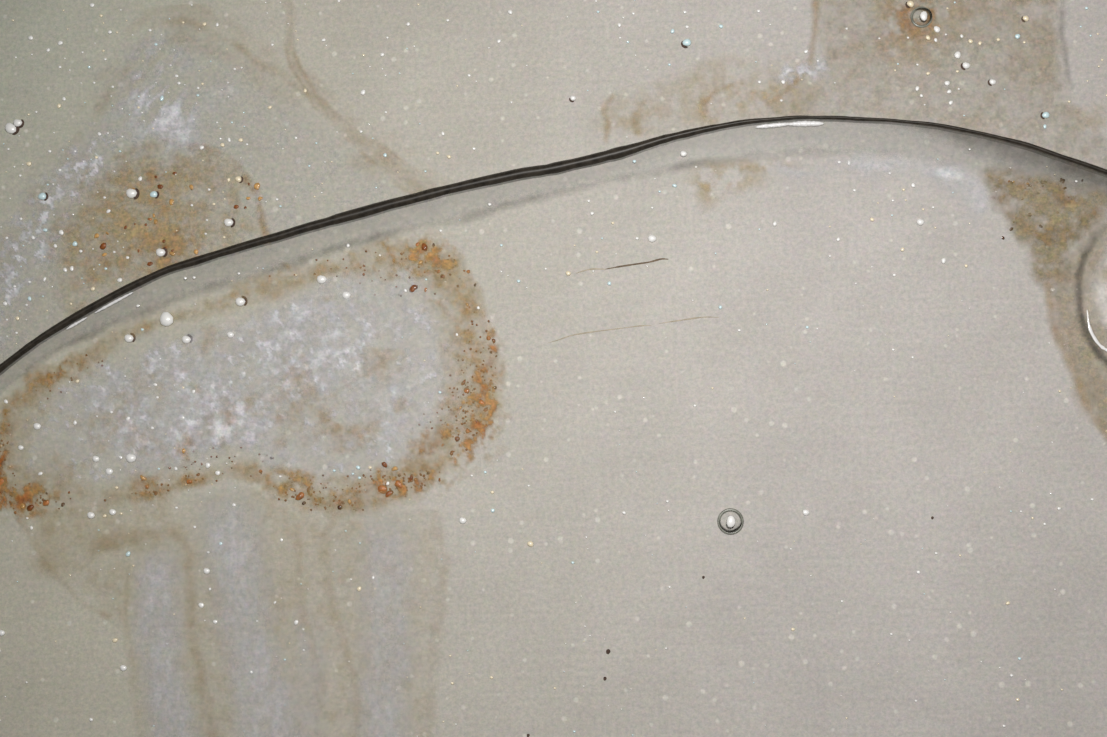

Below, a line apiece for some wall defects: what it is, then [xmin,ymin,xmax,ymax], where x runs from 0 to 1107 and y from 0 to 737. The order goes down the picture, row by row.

damp [898,7,934,38]
damp [127,74,242,146]
damp [0,139,109,305]
rust [67,167,205,280]
rust [359,239,476,297]
rust [418,298,498,462]
damp [1058,289,1107,425]
rust [0,409,71,516]
rust [131,475,170,499]
rust [181,447,242,484]
rust [250,453,441,511]